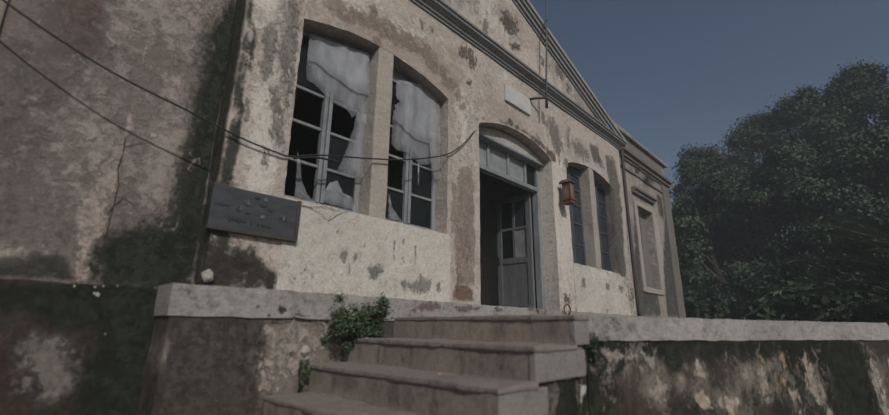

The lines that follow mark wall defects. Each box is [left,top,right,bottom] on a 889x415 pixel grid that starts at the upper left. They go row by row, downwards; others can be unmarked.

crack [94,138,144,278]
leakage [0,0,277,415]